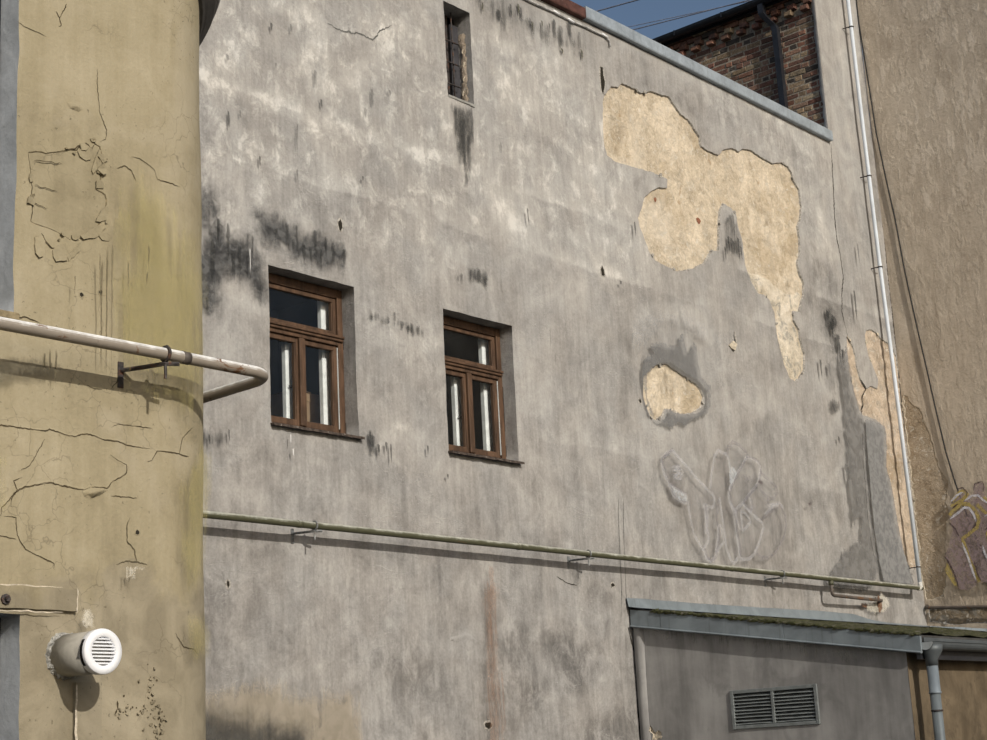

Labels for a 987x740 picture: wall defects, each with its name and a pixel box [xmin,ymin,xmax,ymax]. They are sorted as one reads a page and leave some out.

crack [330,24,390,41]
crack [97,71,107,142]
leakage [456,108,473,162]
flaking render [27,137,112,262]
leakage [201,227,265,314]
leakage [256,213,346,266]
flaking render [599,66,805,382]
flaking render [638,363,705,421]
crack [0,423,193,565]
flaking render [847,329,987,625]
peeling [115,664,168,740]
leakage [206,686,361,740]